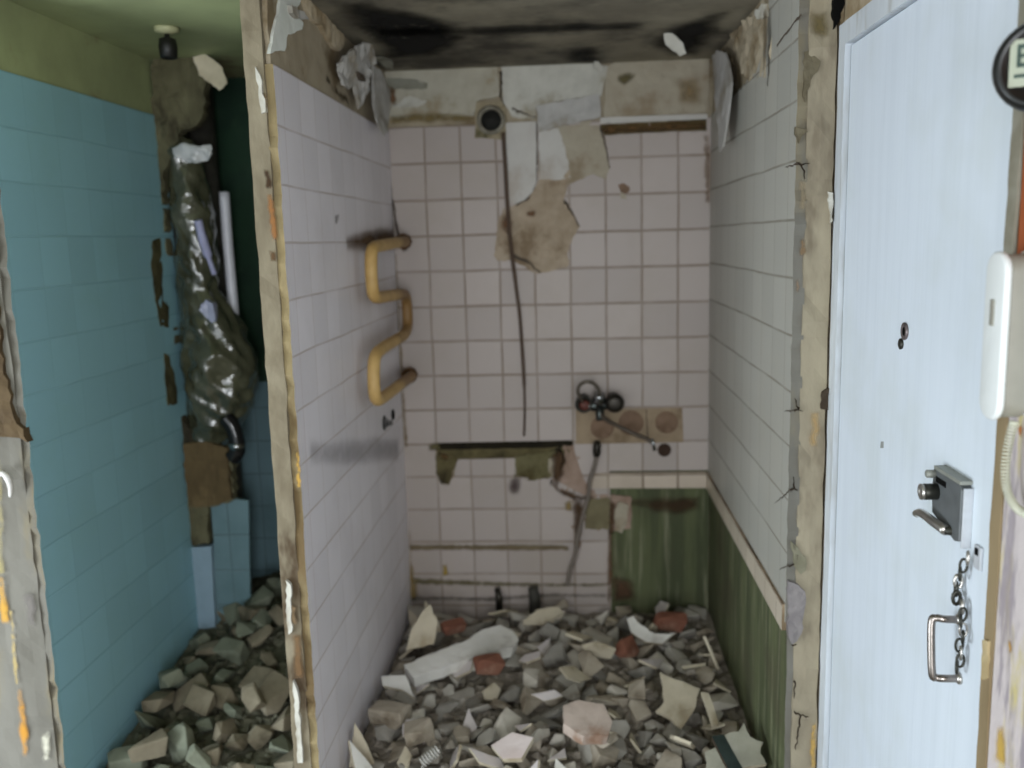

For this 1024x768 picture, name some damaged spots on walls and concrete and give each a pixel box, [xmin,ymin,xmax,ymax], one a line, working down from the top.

spalling [729,0,772,81]
spalling [376,33,710,274]
crack [785,162,810,179]
spalling [150,54,227,406]
spalling [181,415,194,461]
spalling [187,461,239,546]
spalling [435,452,458,486]
crack [785,680,808,750]